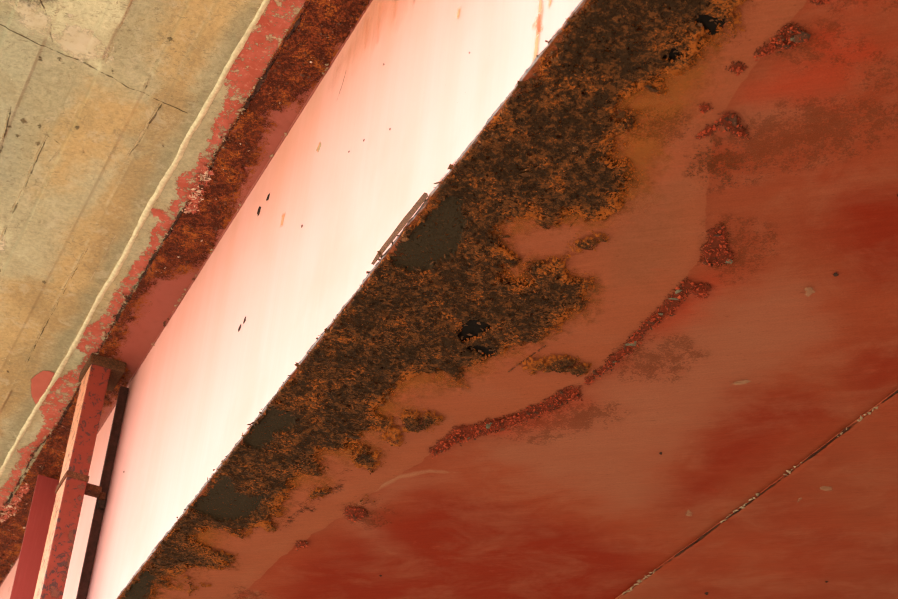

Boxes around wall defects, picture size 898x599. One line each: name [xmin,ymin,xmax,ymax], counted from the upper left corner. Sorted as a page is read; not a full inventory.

crack [0,24,187,155]
corrosion [726,23,811,76]
crack [0,135,58,240]
crack [86,1,311,362]
crack [26,251,87,361]
peeling [0,0,305,523]
corrosion [99,0,753,599]
crack [0,386,79,524]
corrosion [0,384,81,585]
peeling [49,530,75,598]